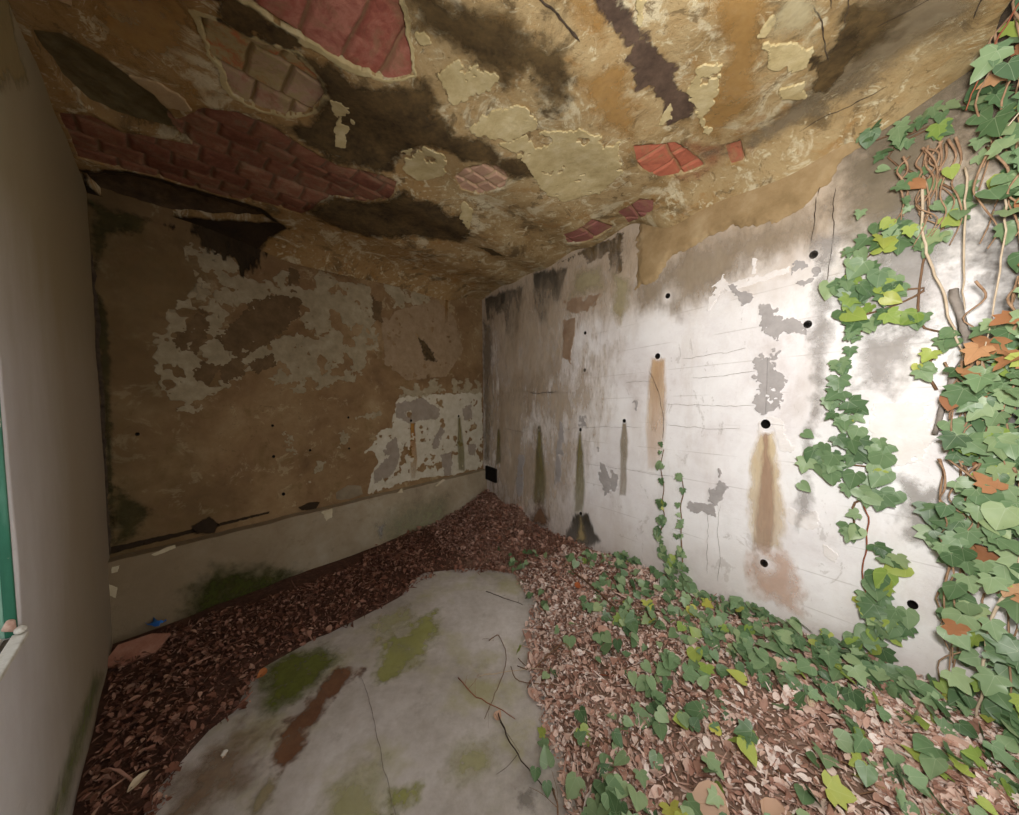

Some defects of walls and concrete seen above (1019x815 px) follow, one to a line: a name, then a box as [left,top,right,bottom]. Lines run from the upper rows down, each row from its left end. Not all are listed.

spalling [188,0,431,148]
leakage [216,0,534,180]
leakage [311,191,470,242]
leakage [411,0,633,132]
crack [540,0,580,42]
peeling [633,62,745,176]
leakage [845,67,993,316]
peeling [152,242,483,494]
corrosion [650,360,664,418]
peeling [707,258,821,453]
corrosion [750,434,798,608]
crack [361,677,396,815]